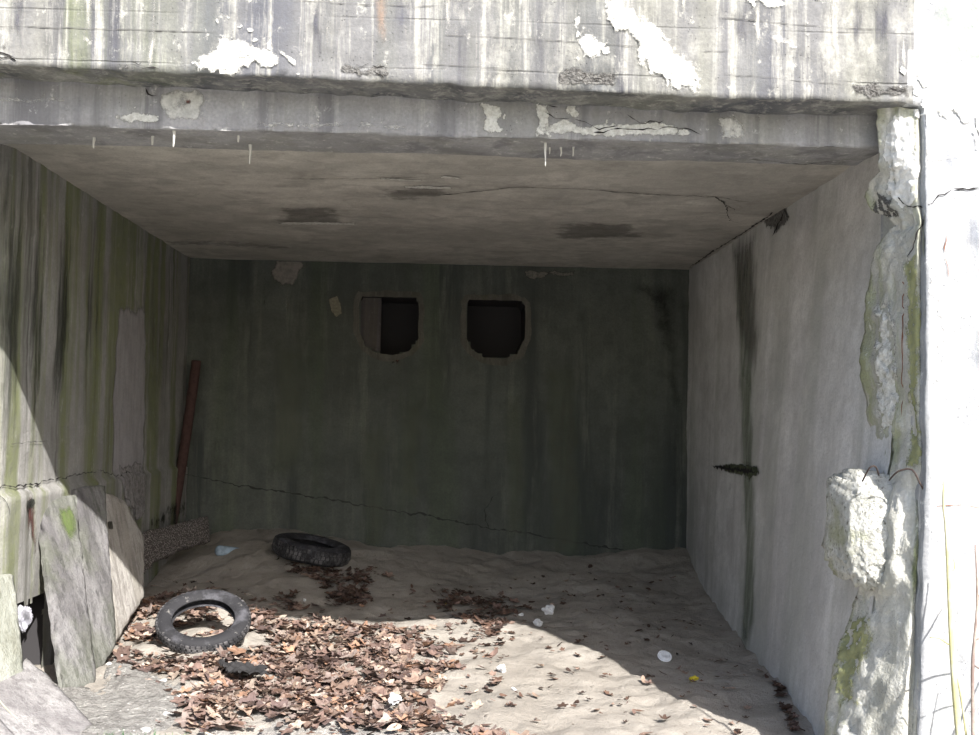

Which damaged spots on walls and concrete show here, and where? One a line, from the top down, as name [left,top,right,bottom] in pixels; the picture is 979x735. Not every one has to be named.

peeling [192,25,299,77]
spalling [559,16,615,85]
peeling [605,0,701,93]
spalling [763,208,788,233]
crack [898,188,977,257]
damp [8,231,20,400]
damp [34,247,43,378]
damp [56,258,67,373]
peeling [874,301,899,432]
crack [898,282,906,414]
crack [0,469,130,512]
crack [186,474,625,551]